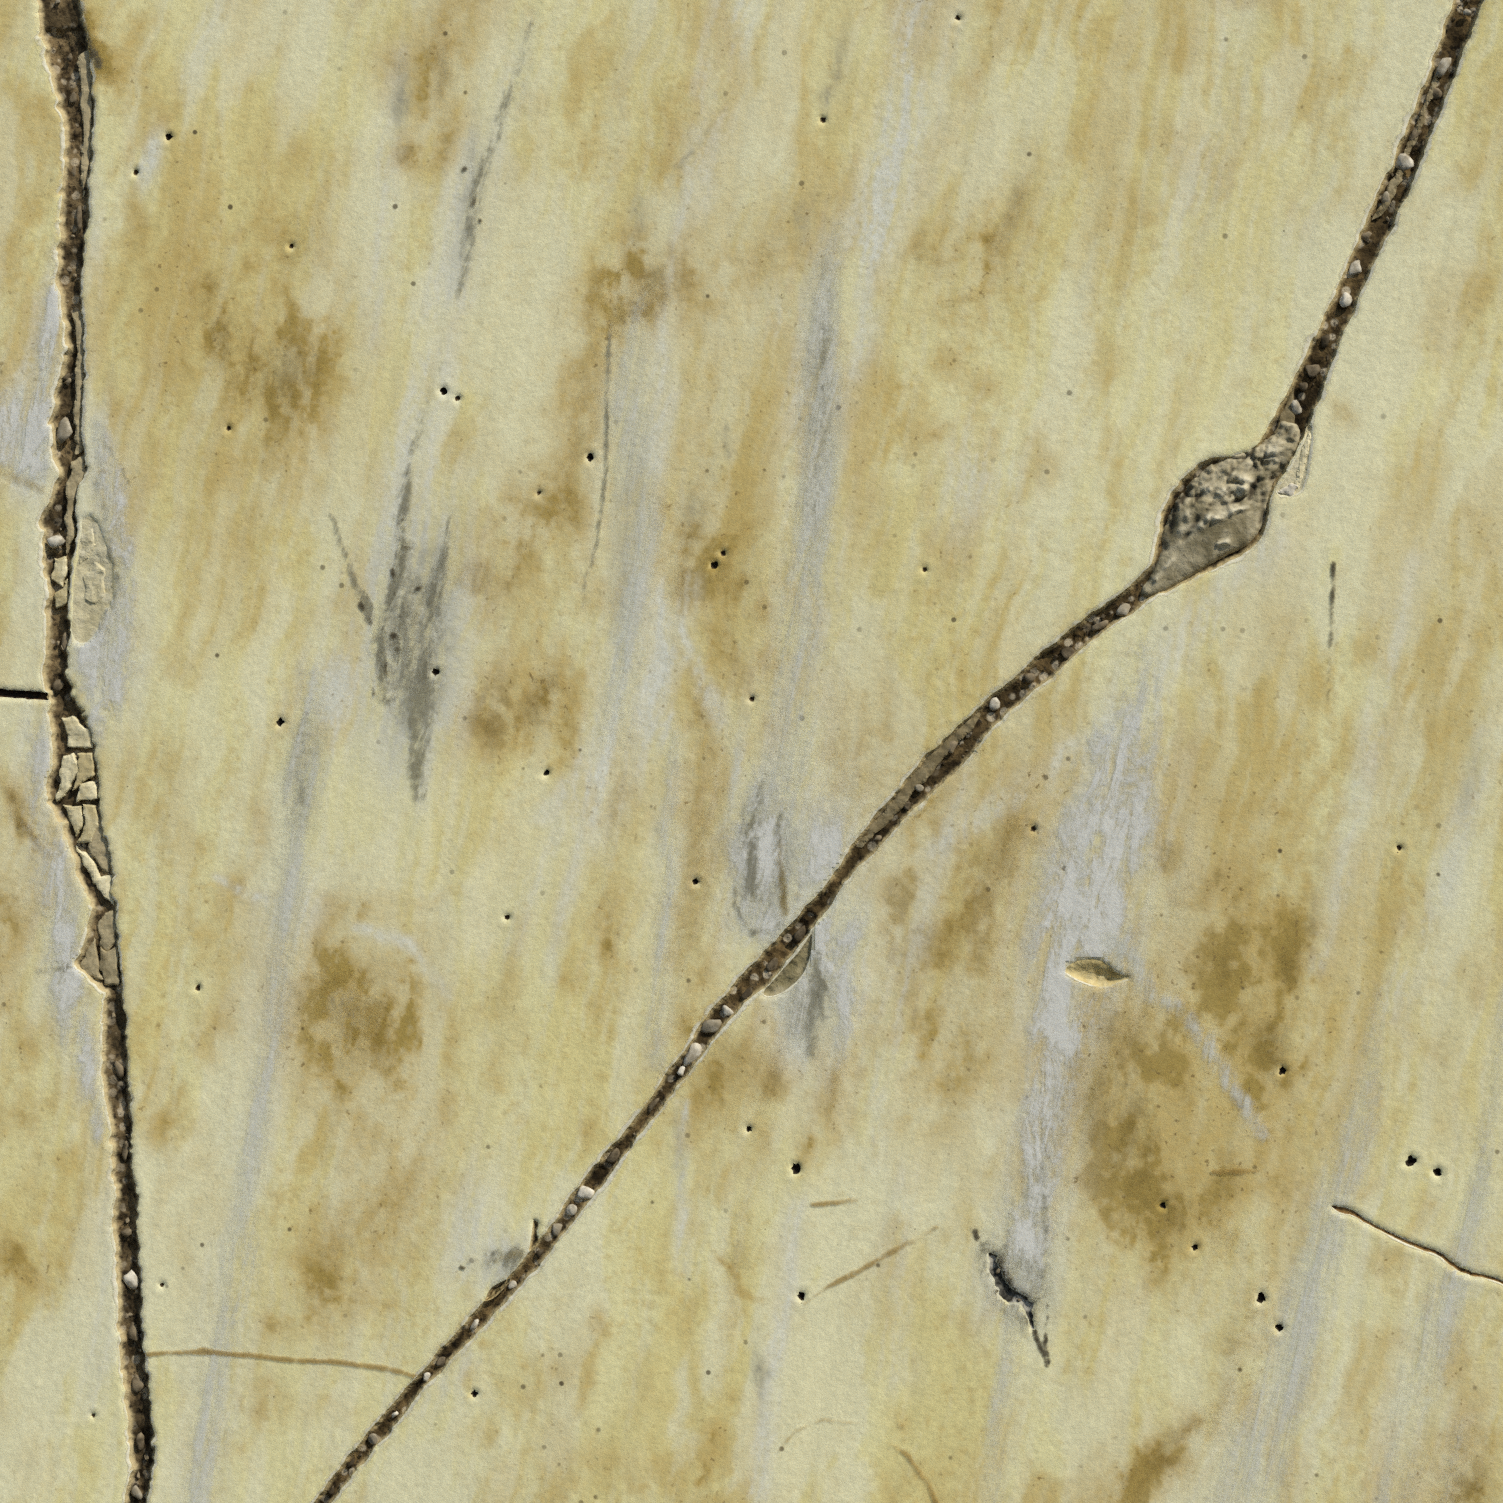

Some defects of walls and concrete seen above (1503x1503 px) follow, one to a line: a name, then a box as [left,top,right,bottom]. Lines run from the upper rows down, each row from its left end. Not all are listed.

peeling [29,733,50,815]
peeling [42,837,103,1140]
crack [0,0,158,1503]
crack [310,0,1503,1503]
leakage [1006,682,1267,1288]